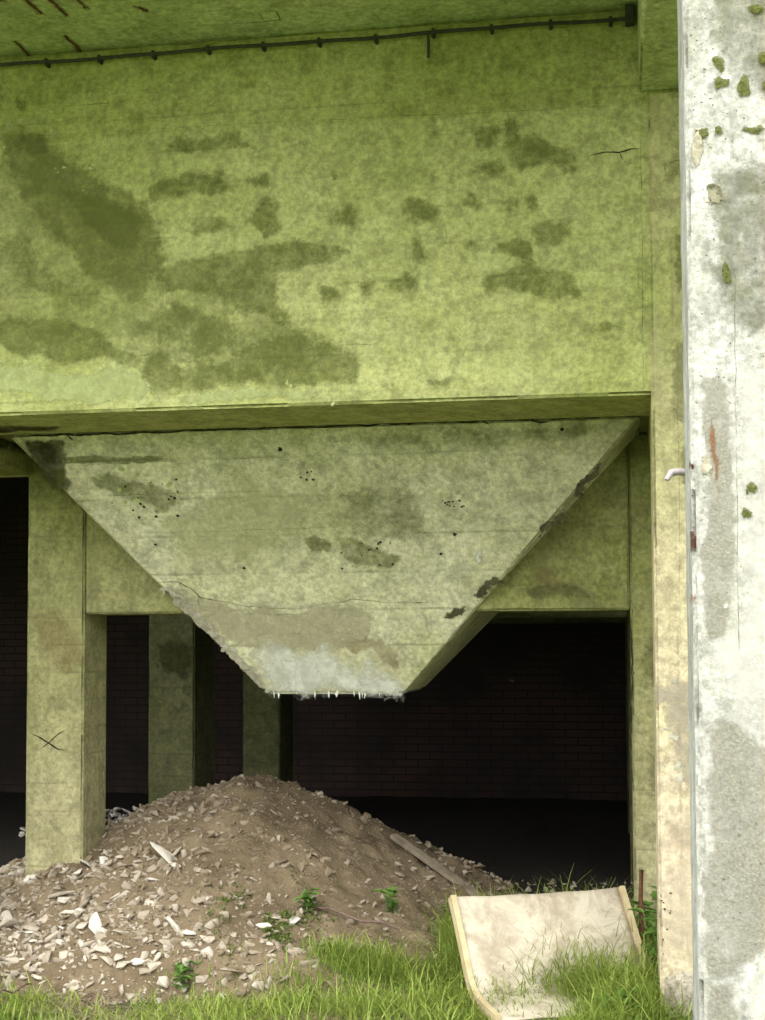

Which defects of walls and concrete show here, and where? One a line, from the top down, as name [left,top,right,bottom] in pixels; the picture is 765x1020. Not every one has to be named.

crack [594,148,642,189]
water stain [407,199,437,219]
water stain [158,243,339,313]
water stain [486,242,548,292]
water stain [0,426,159,490]
rust [710,426,718,479]